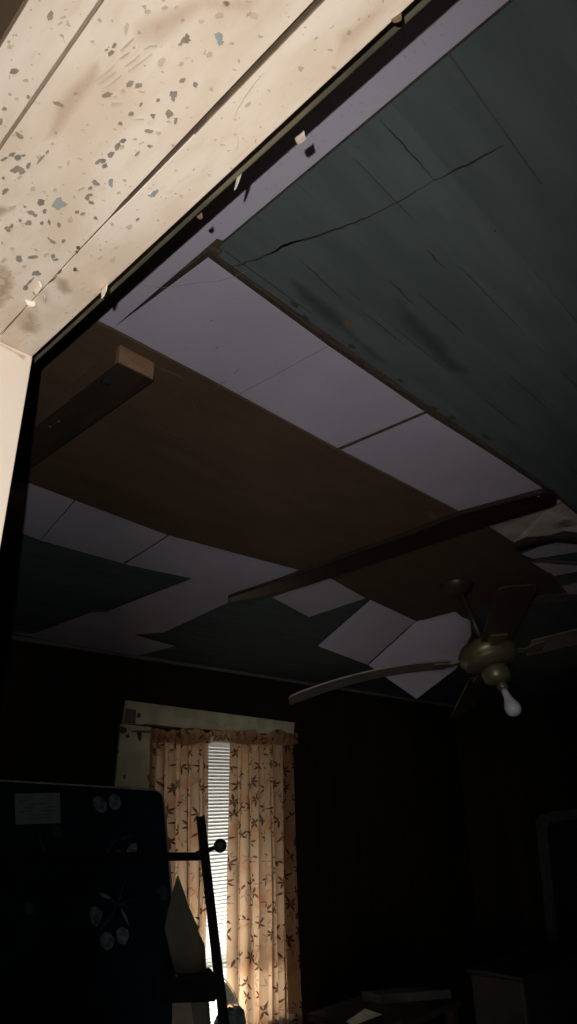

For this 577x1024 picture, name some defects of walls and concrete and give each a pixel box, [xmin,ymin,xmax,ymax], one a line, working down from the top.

peeling [206,32,224,57]
peeling [0,61,198,307]
crack [232,119,505,298]